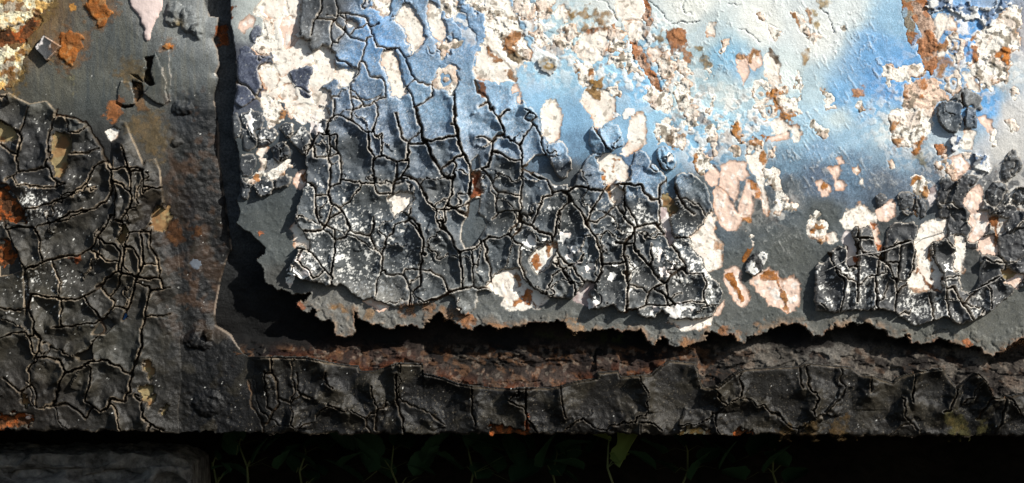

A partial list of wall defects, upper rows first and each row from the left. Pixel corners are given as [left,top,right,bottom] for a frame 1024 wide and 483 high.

corrosion [0,0,114,94]
peeling [238,0,357,129]
corrosion [630,40,663,92]
corrosion [642,0,712,69]
corrosion [901,0,953,99]
peeling [880,0,1022,156]
crack [232,0,723,320]
peeling [371,0,829,332]
crack [0,92,185,434]
crack [813,149,1024,326]
peeling [907,184,1007,293]
crack [247,356,1024,438]